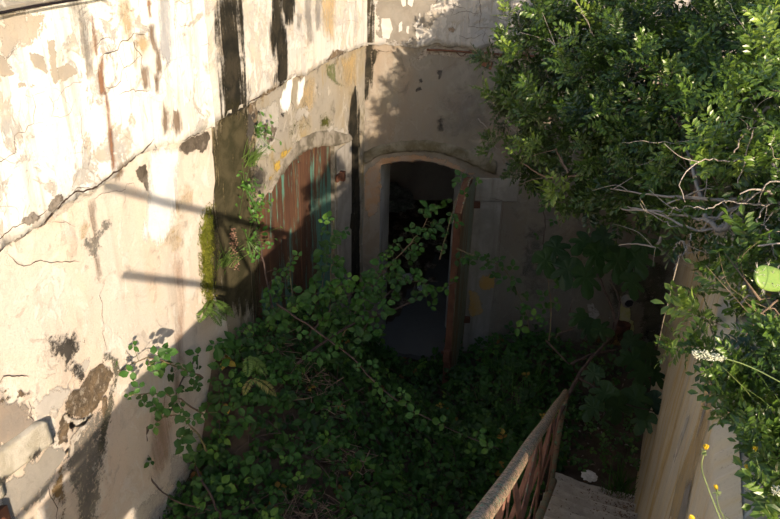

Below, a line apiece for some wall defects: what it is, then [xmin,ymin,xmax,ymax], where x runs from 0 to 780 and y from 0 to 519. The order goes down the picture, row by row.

peeling [0,10,77,88]
crack [0,82,84,164]
crack [0,139,157,266]
corrosion [92,17,115,169]
crack [96,33,149,101]
flaking render [136,164,149,193]
flaking render [179,131,210,155]
water stain [209,0,265,318]
water stain [270,0,334,118]
water stain [344,0,377,315]
mould [46,330,85,384]
peeling [0,359,113,519]